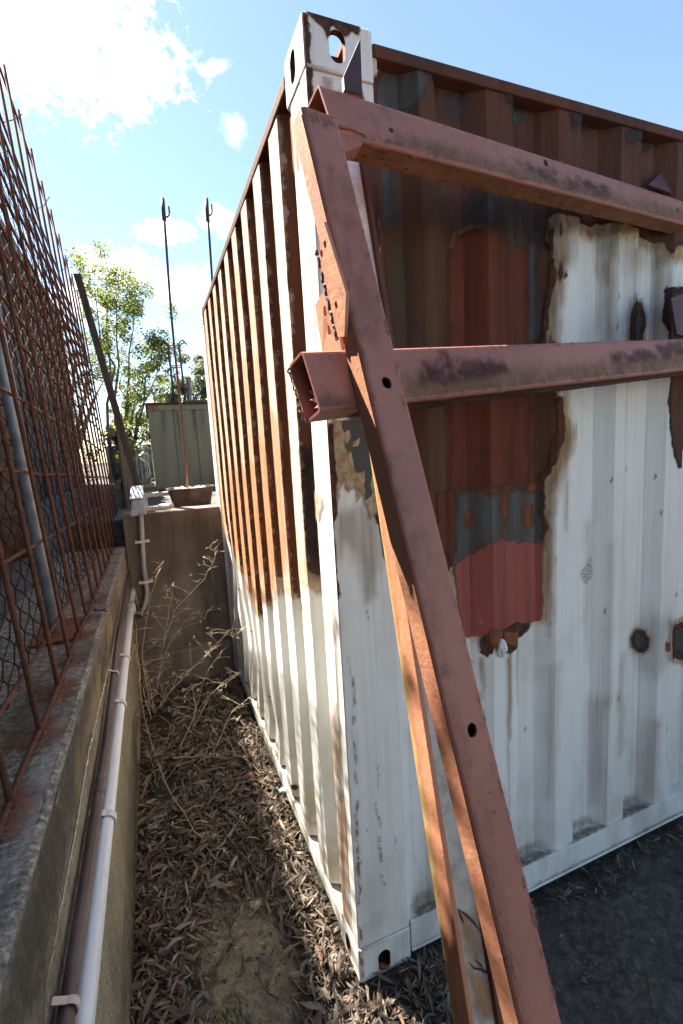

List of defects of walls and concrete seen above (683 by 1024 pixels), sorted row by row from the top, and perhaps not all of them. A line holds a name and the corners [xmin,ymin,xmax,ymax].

corrosion [357,70,683,202]
corrosion [349,143,683,349]
peeling [542,223,568,344]
corrosion [204,113,322,617]
peeling [333,417,378,519]
corrosion [407,372,683,571]
peeling [539,396,565,538]
peeling [489,629,518,647]
corrosion [630,630,650,653]
corrosion [666,619,683,661]
corrosion [331,699,361,925]